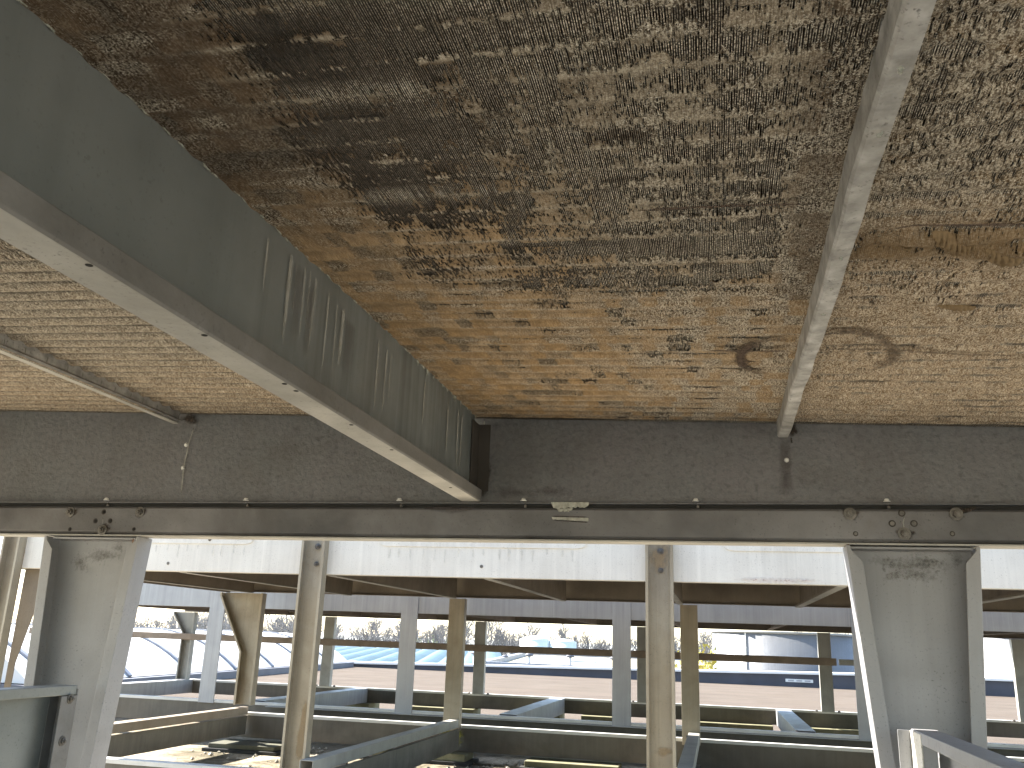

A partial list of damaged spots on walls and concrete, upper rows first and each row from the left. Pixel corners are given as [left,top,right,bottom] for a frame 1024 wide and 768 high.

leakage [274,226,345,355]
leakage [711,338,784,374]
leakage [824,328,1010,369]